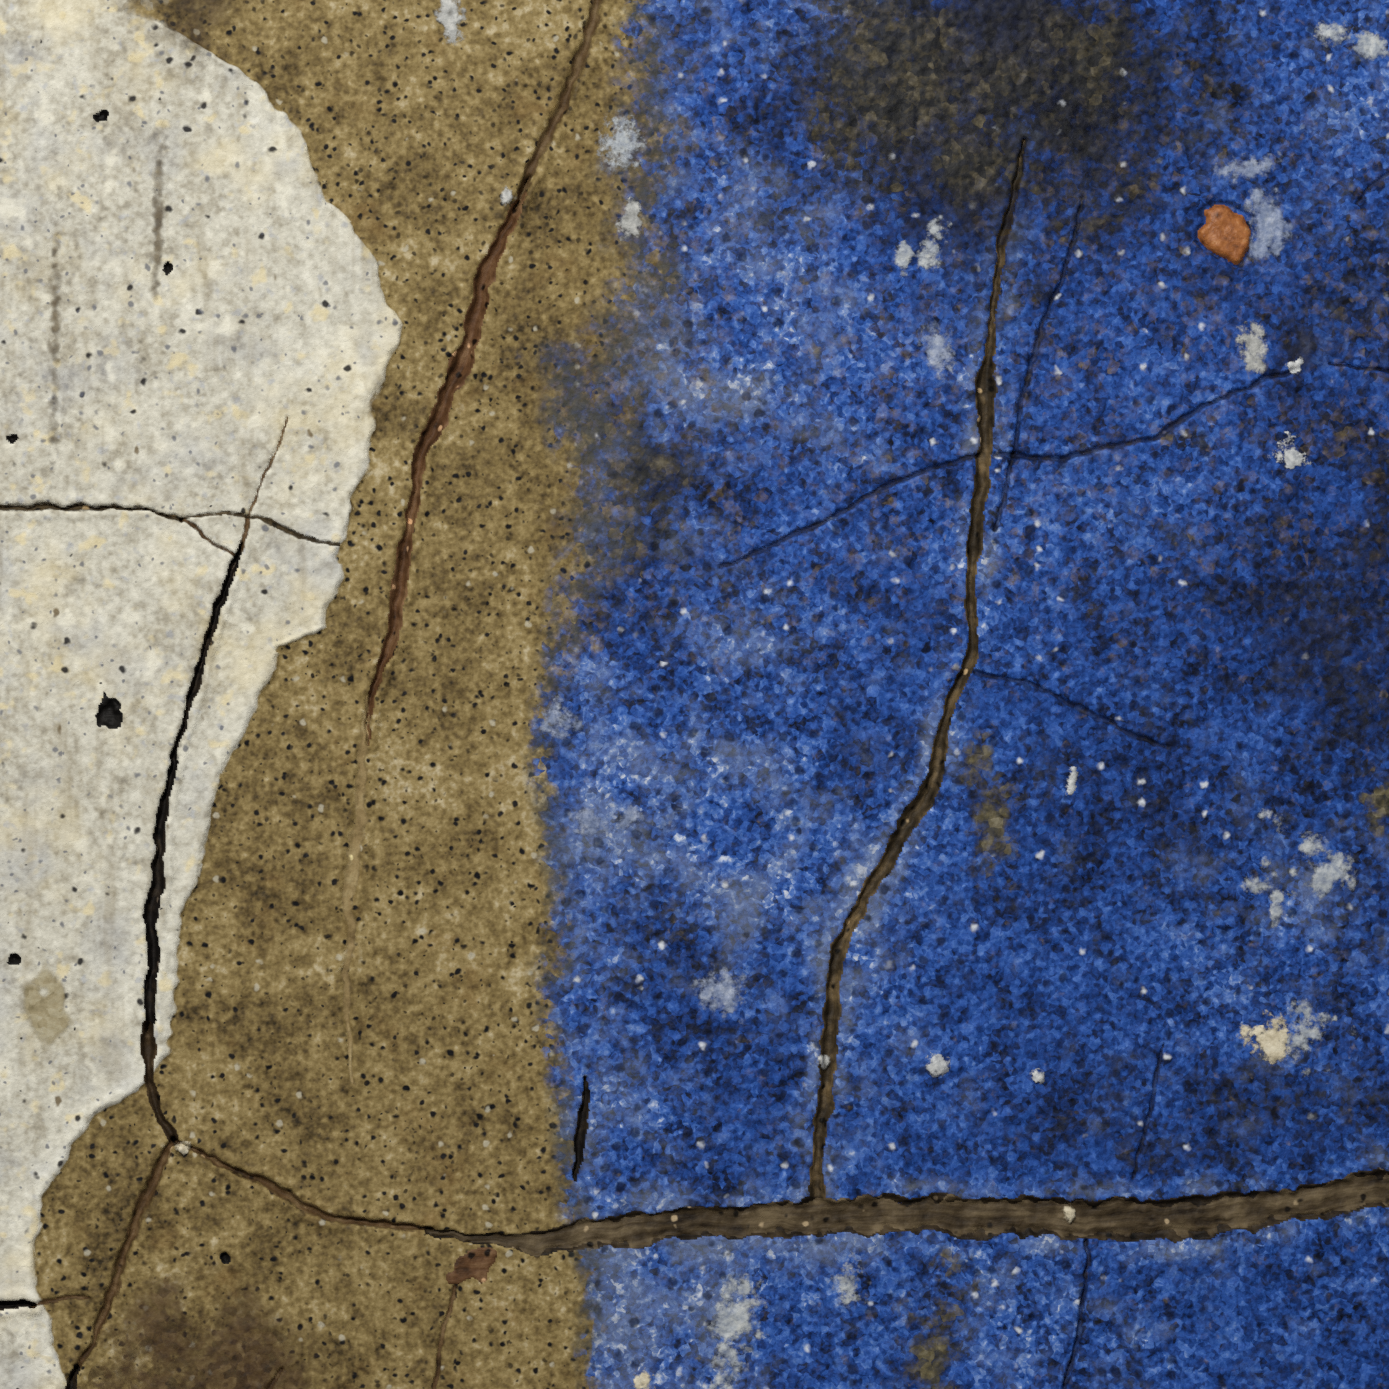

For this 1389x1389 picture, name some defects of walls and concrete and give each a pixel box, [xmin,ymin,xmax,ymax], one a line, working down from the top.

peeling [434,0,466,43]
spalling [93,110,109,122]
water stain [894,0,1065,227]
spalling [95,691,123,729]
crack [189,138,1389,1389]
crack [0,417,340,1389]
spalling [220,1251,231,1264]